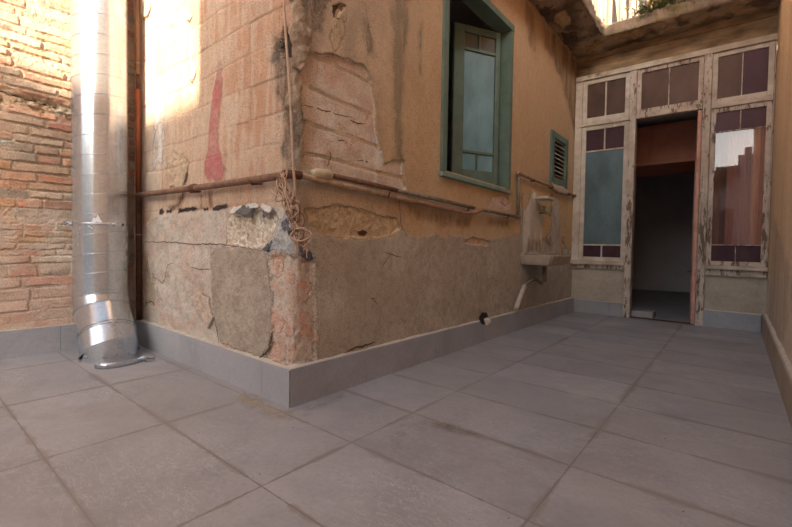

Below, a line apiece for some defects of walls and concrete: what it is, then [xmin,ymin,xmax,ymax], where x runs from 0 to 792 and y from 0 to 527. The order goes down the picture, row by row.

spalling [537,0,578,42]
damp [272,38,304,165]
spalling [280,4,406,190]
spalling [226,203,319,365]
spalling [304,201,407,240]